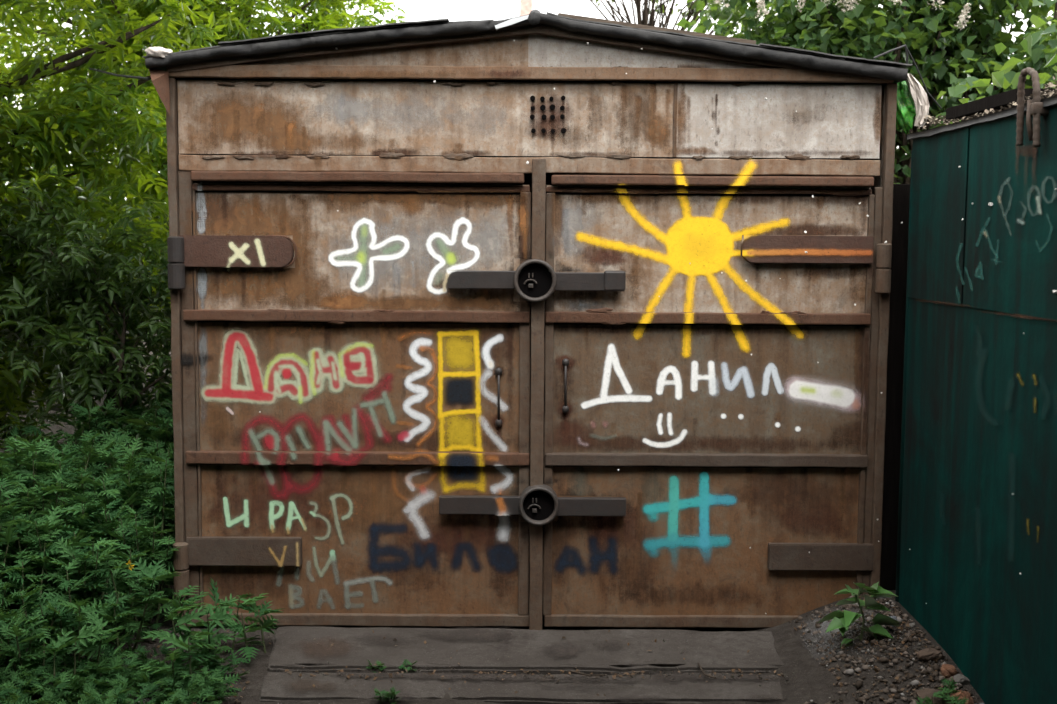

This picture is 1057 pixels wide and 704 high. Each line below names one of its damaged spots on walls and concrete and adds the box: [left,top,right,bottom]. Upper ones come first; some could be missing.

rust [191,93,360,160]
rust [372,139,414,155]
rust [447,144,485,156]
rust [621,83,713,154]